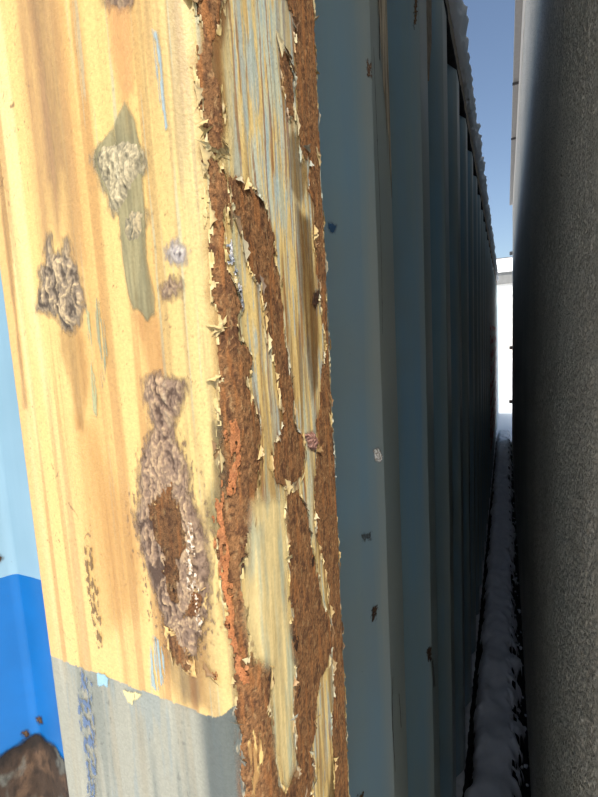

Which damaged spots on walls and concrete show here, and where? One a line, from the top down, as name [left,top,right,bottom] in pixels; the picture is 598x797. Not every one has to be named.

peeling [367,0,392,188]
rust [187,0,364,797]
rust [183,588,208,621]
rust [163,614,218,702]
rust [0,731,69,797]